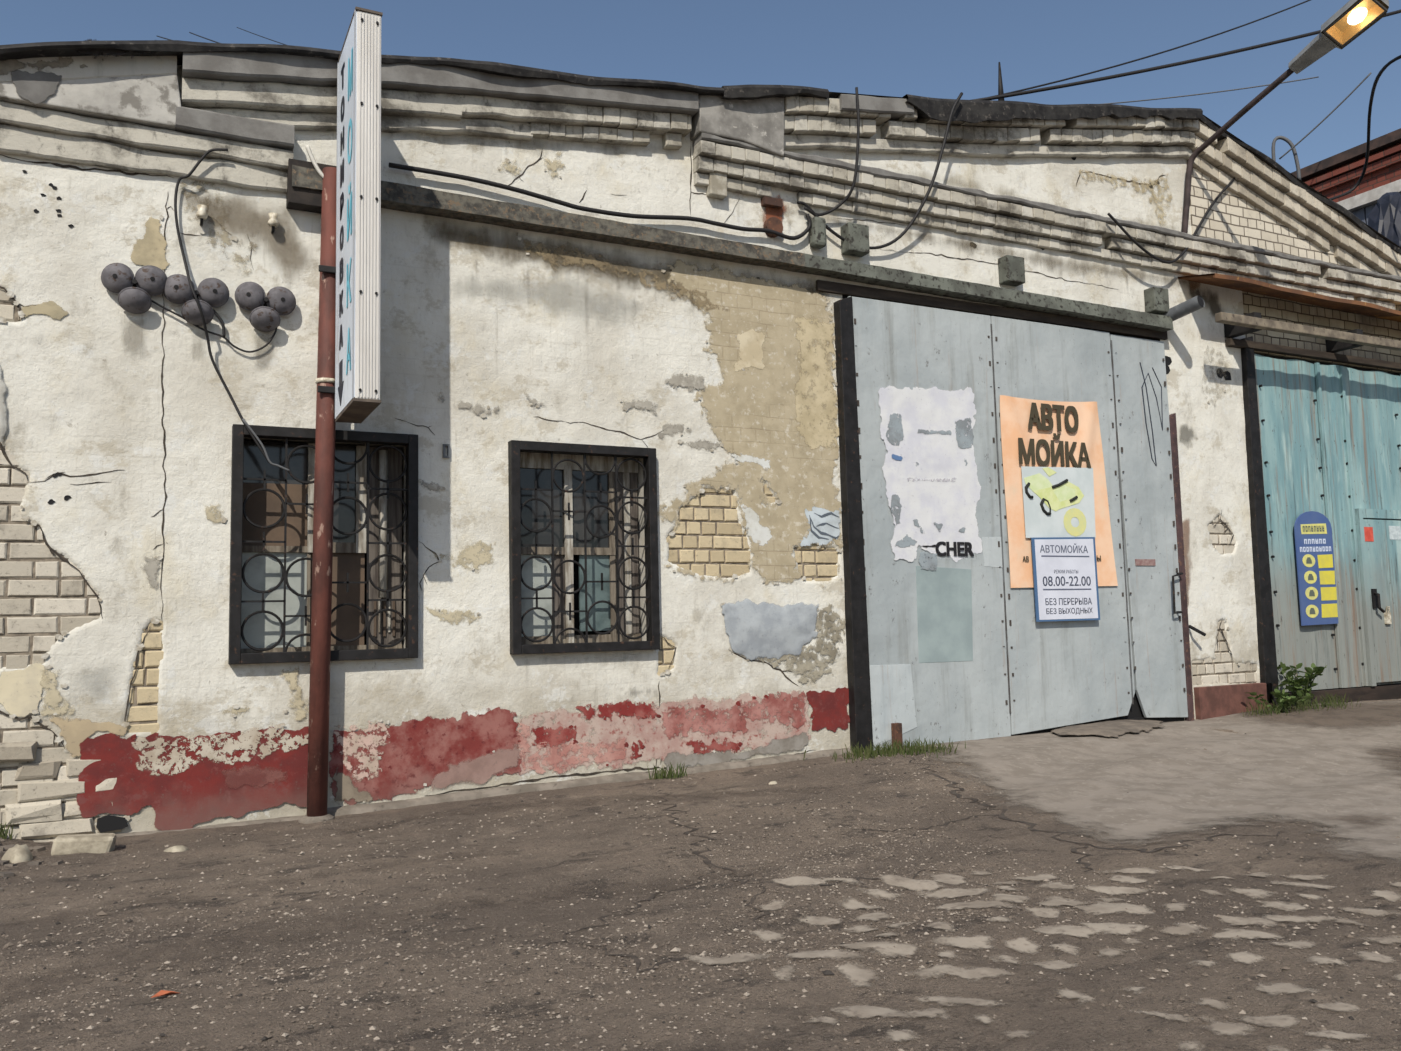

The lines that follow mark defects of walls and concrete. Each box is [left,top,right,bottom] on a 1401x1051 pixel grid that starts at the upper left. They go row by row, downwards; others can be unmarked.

peeling [131,215,170,270]
flaking render [0,288,68,323]
crack [0,154,254,722]
peeling [437,392,499,418]
peeling [518,237,843,587]
peeling [435,540,495,573]
flaking render [1208,514,1236,554]
flaking render [0,441,309,842]
flaking render [1192,619,1257,685]
peeling [423,604,846,789]
peeling [332,719,390,803]